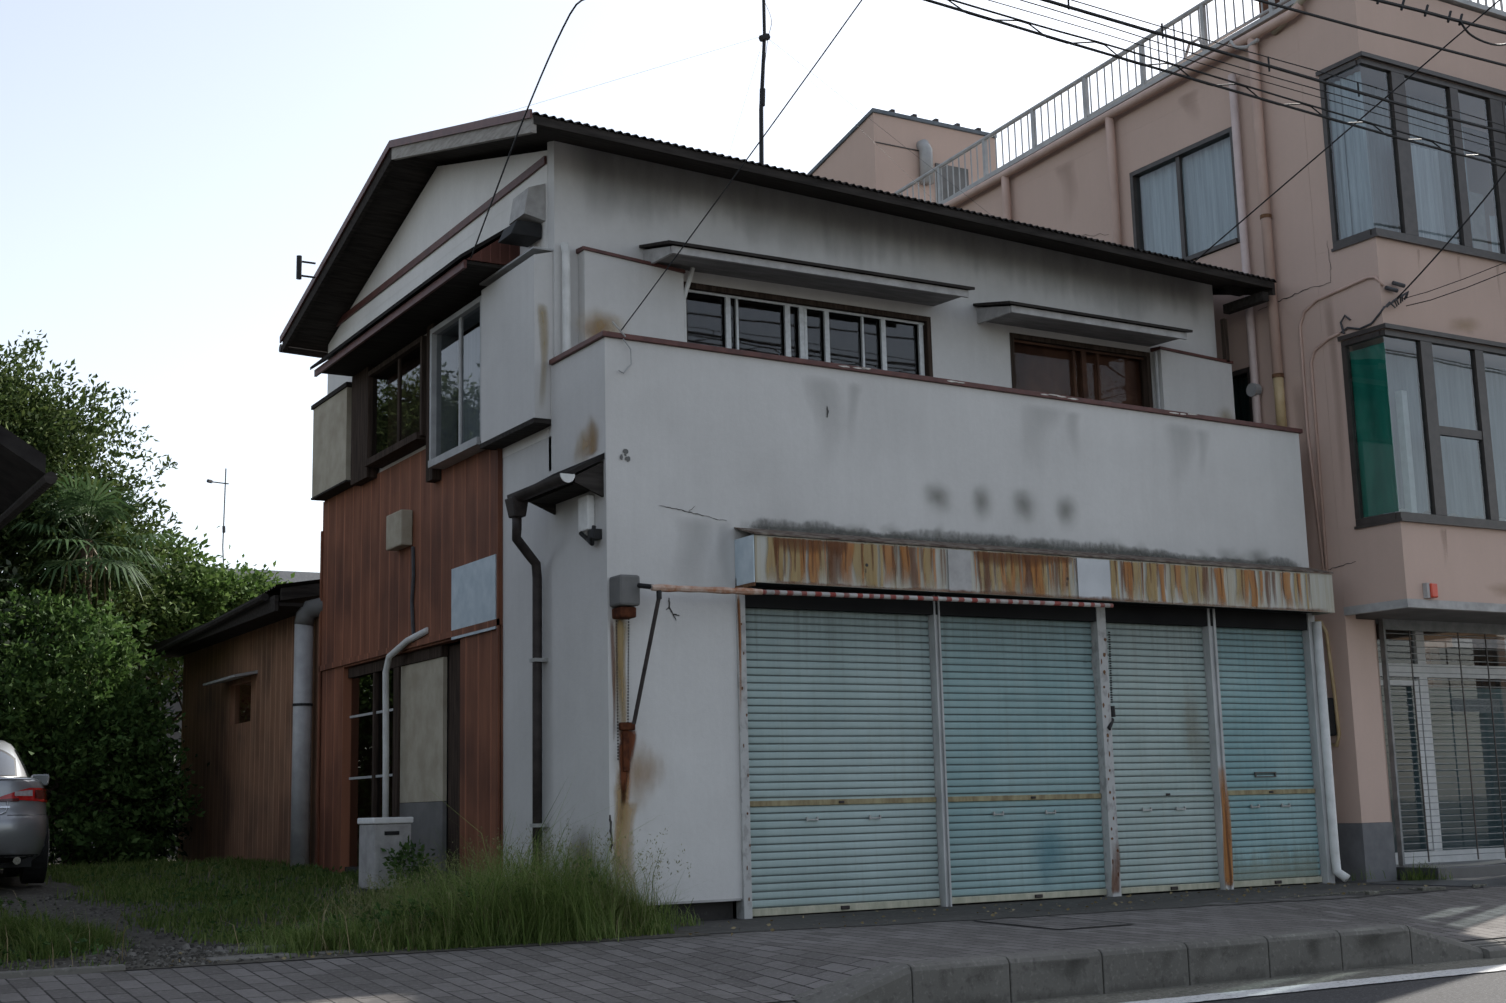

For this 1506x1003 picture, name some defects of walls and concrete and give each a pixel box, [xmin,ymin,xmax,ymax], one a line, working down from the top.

rust [767,537,1323,612]
rust [611,619,626,708]
rust [615,730,640,871]
rust [1220,777,1233,884]